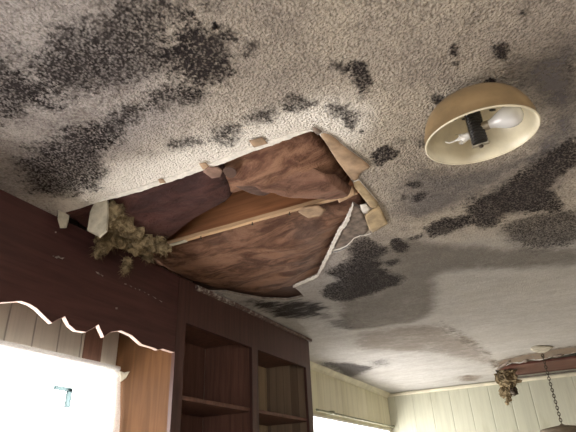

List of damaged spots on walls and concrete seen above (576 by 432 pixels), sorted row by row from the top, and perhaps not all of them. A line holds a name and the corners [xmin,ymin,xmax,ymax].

water stain [0,0,238,197]
water stain [212,109,276,146]
peeling [58,211,69,228]
spalling [87,126,322,238]
peeling [293,203,370,288]
water stain [319,49,576,328]
water stain [324,361,381,376]
water stain [495,346,576,368]